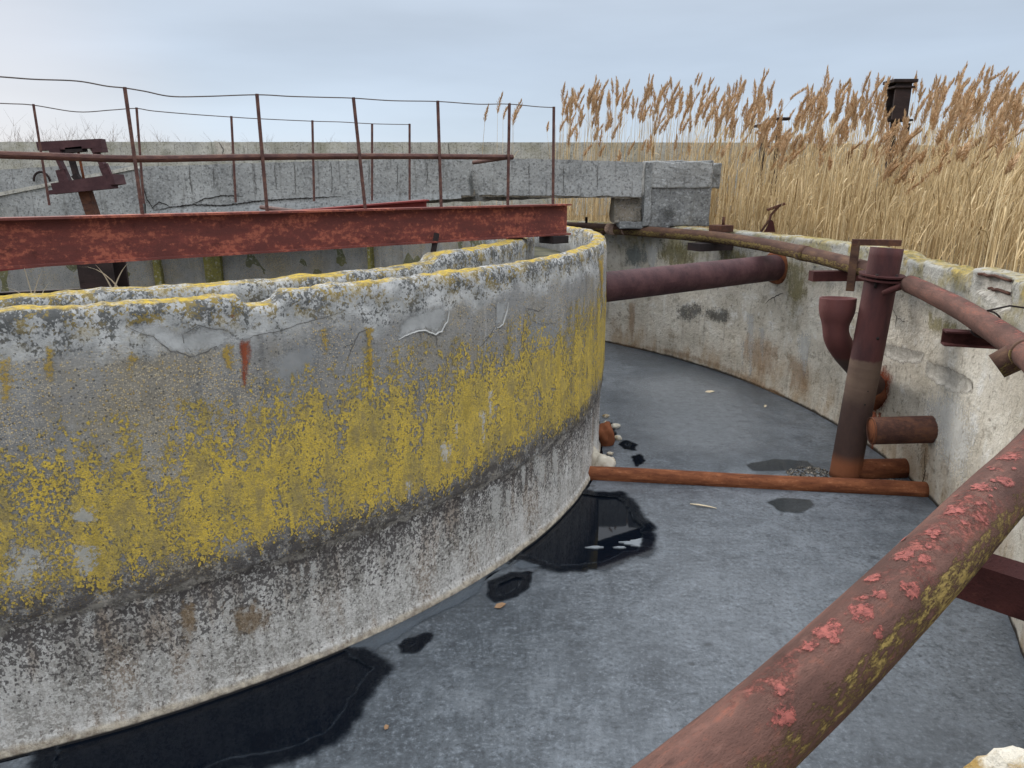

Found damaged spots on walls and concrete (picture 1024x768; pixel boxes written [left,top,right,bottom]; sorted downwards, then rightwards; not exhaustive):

leakage [677,304,729,322]
crack [127,313,337,357]
rust [240,341,250,385]
leakage [70,507,98,523]
leakage [4,548,49,589]
leakage [72,545,98,576]
leakage [280,561,317,596]